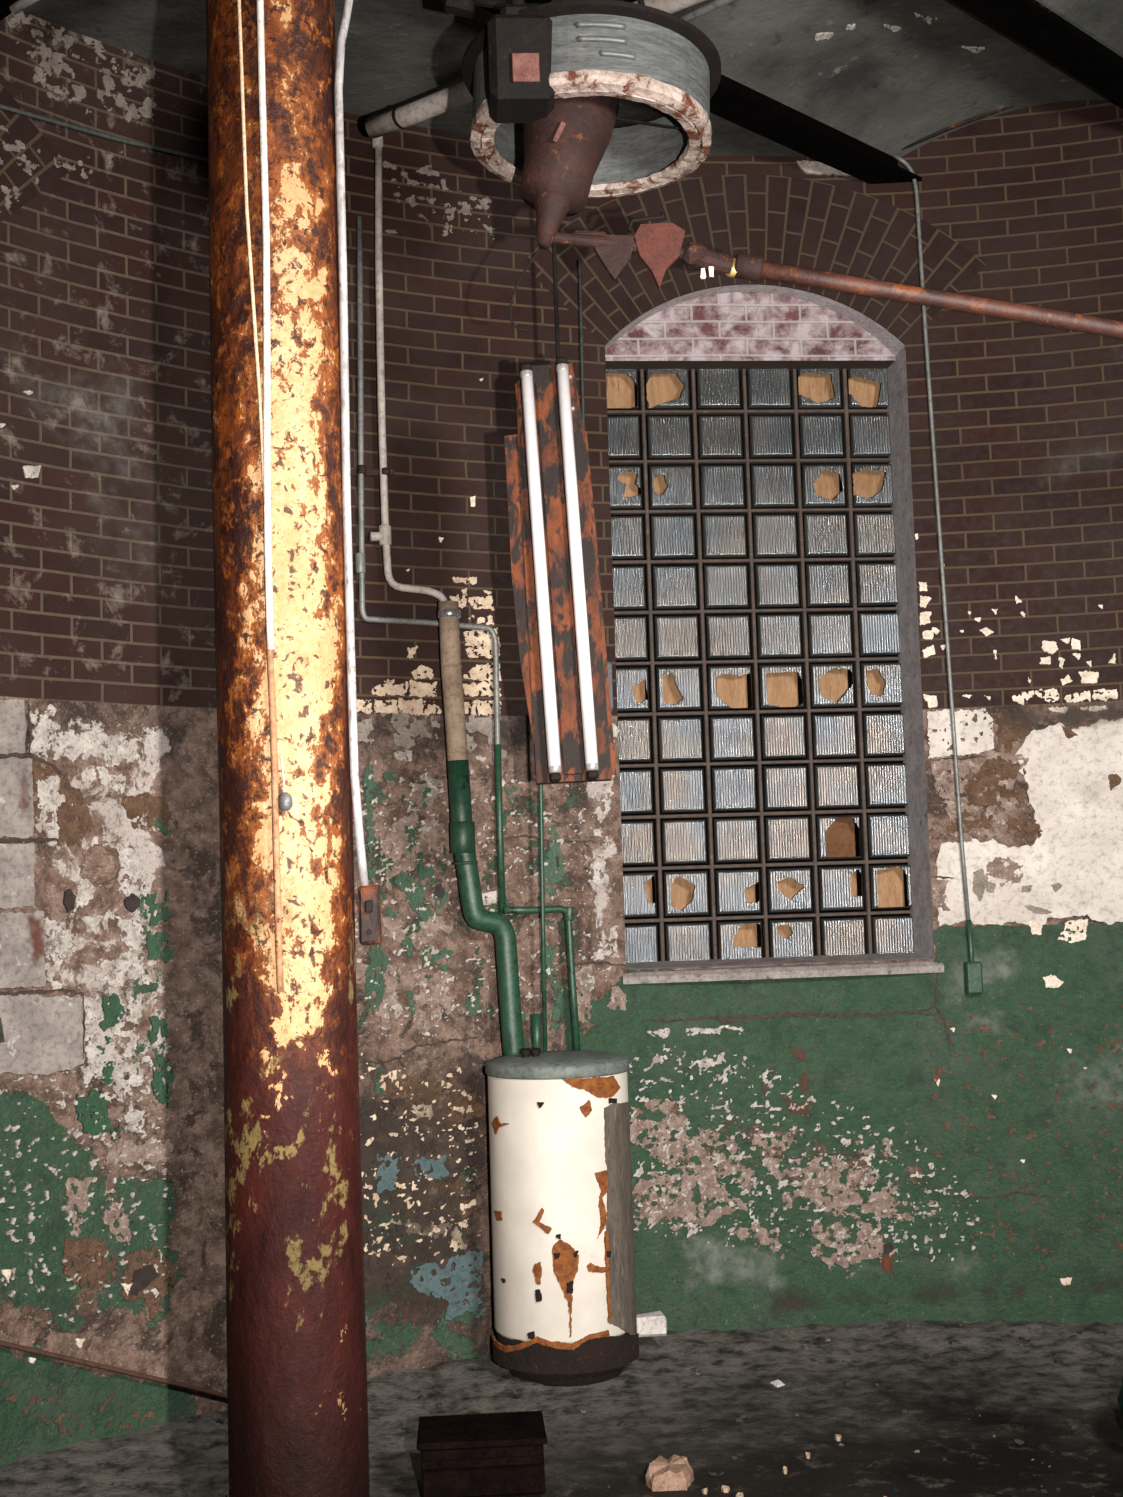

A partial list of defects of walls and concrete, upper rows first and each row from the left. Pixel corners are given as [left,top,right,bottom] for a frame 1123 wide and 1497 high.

peeling [0,125,122,213]
peeling [7,11,159,126]
peeling [918,582,946,658]
peeling [960,609,998,660]
peeling [449,577,629,1048]
peeling [923,638,1123,943]
peeling [353,646,501,1326]
peeling [629,975,1123,1285]